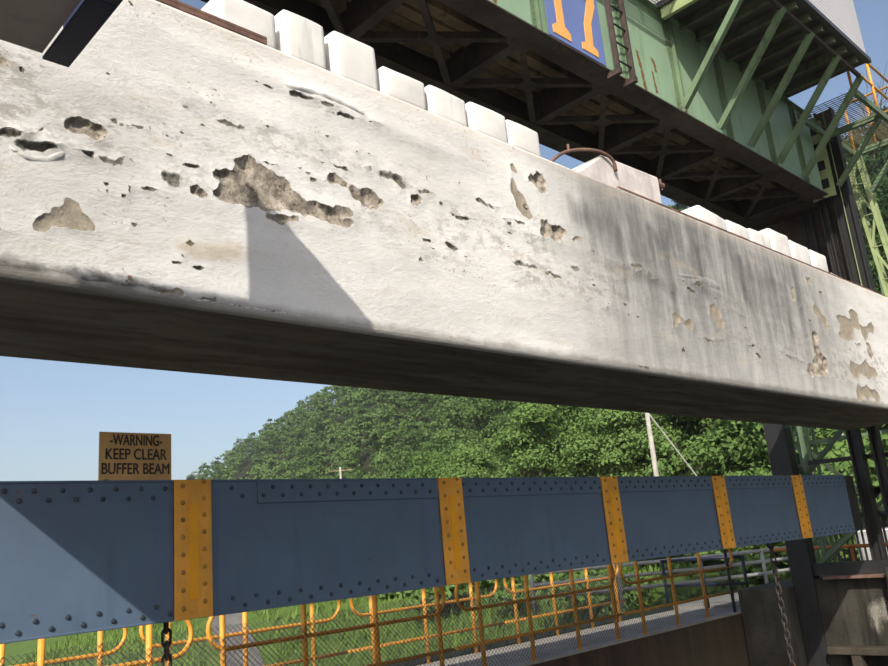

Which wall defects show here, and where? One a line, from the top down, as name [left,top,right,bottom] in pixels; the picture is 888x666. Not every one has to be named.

spalling [0,53,26,73]
spalling [64,116,110,141]
peeling [32,197,100,233]
spalling [161,154,384,229]
spalling [510,163,595,252]
peeling [806,304,887,404]